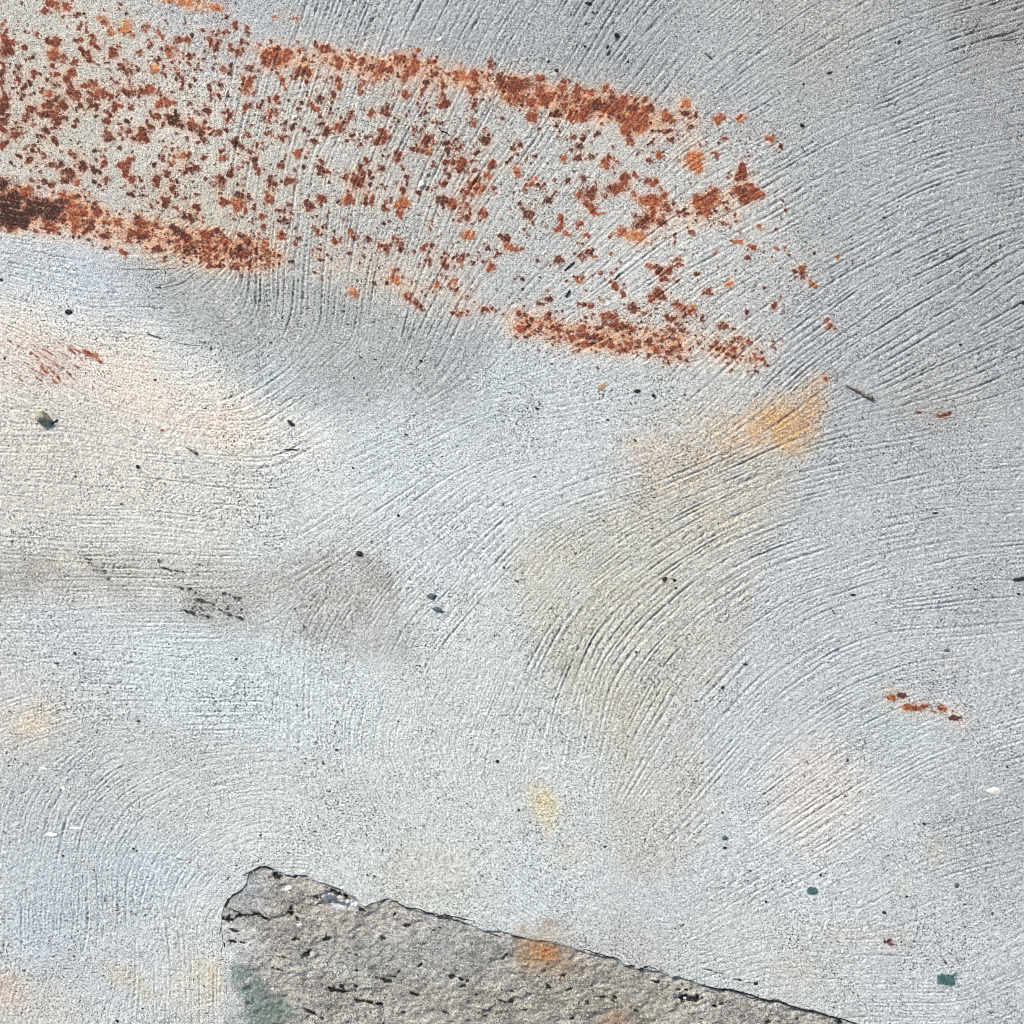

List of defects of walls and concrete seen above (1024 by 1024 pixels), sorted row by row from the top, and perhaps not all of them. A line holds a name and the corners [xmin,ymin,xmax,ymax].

corrosion [0,0,847,569]
corrosion [864,654,983,738]
spalling [222,867,846,1024]